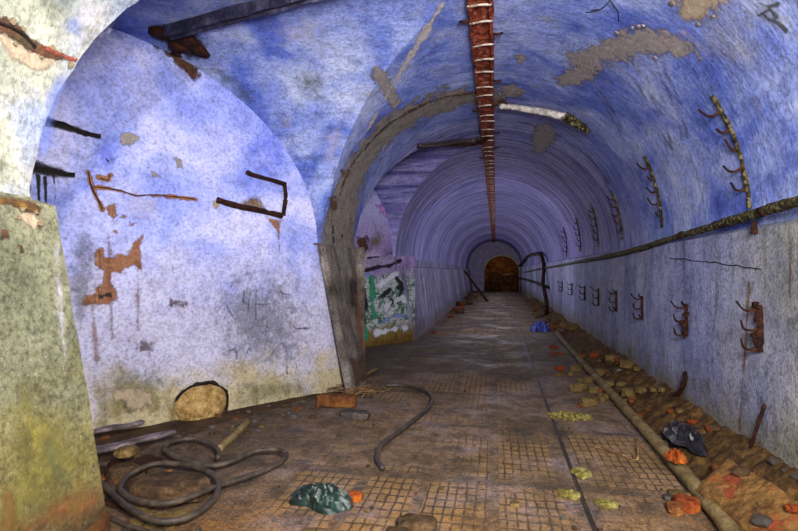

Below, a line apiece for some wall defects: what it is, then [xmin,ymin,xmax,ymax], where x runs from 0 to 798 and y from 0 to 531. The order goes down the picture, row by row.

spalling [0,16,77,70]
spalling [356,2,445,156]
peeling [554,21,703,87]
peeling [669,0,730,26]
peeling [106,203,136,226]
peeling [81,235,144,306]